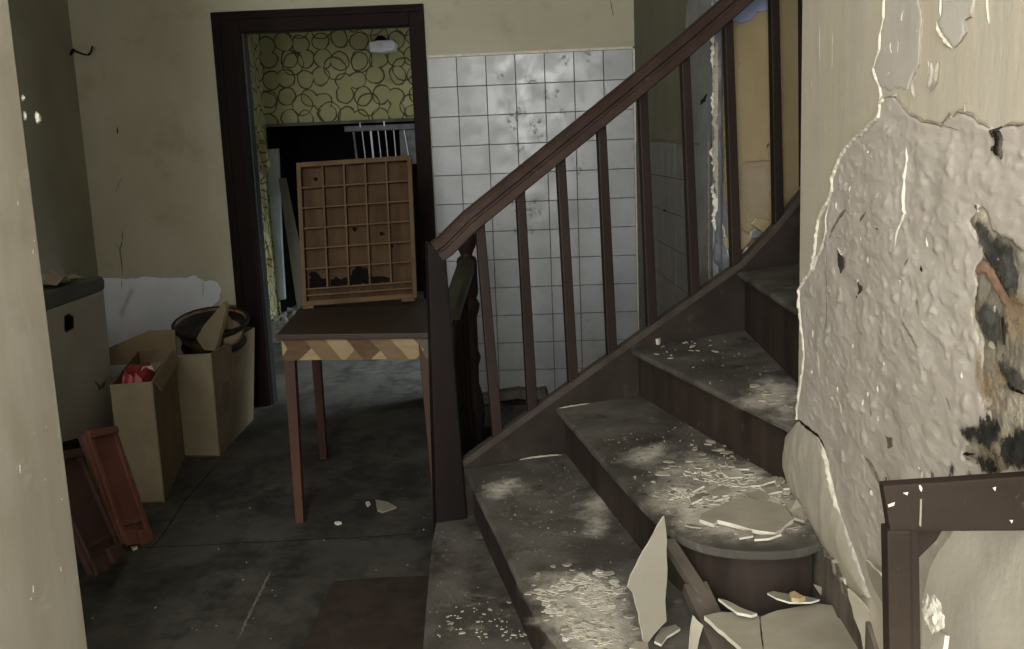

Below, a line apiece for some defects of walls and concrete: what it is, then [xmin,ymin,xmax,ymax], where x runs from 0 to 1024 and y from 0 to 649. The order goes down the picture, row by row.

peeling [102,275,221,347]
peeling [750,0,1024,618]
crack [798,420,831,458]
peeling [919,531,952,649]